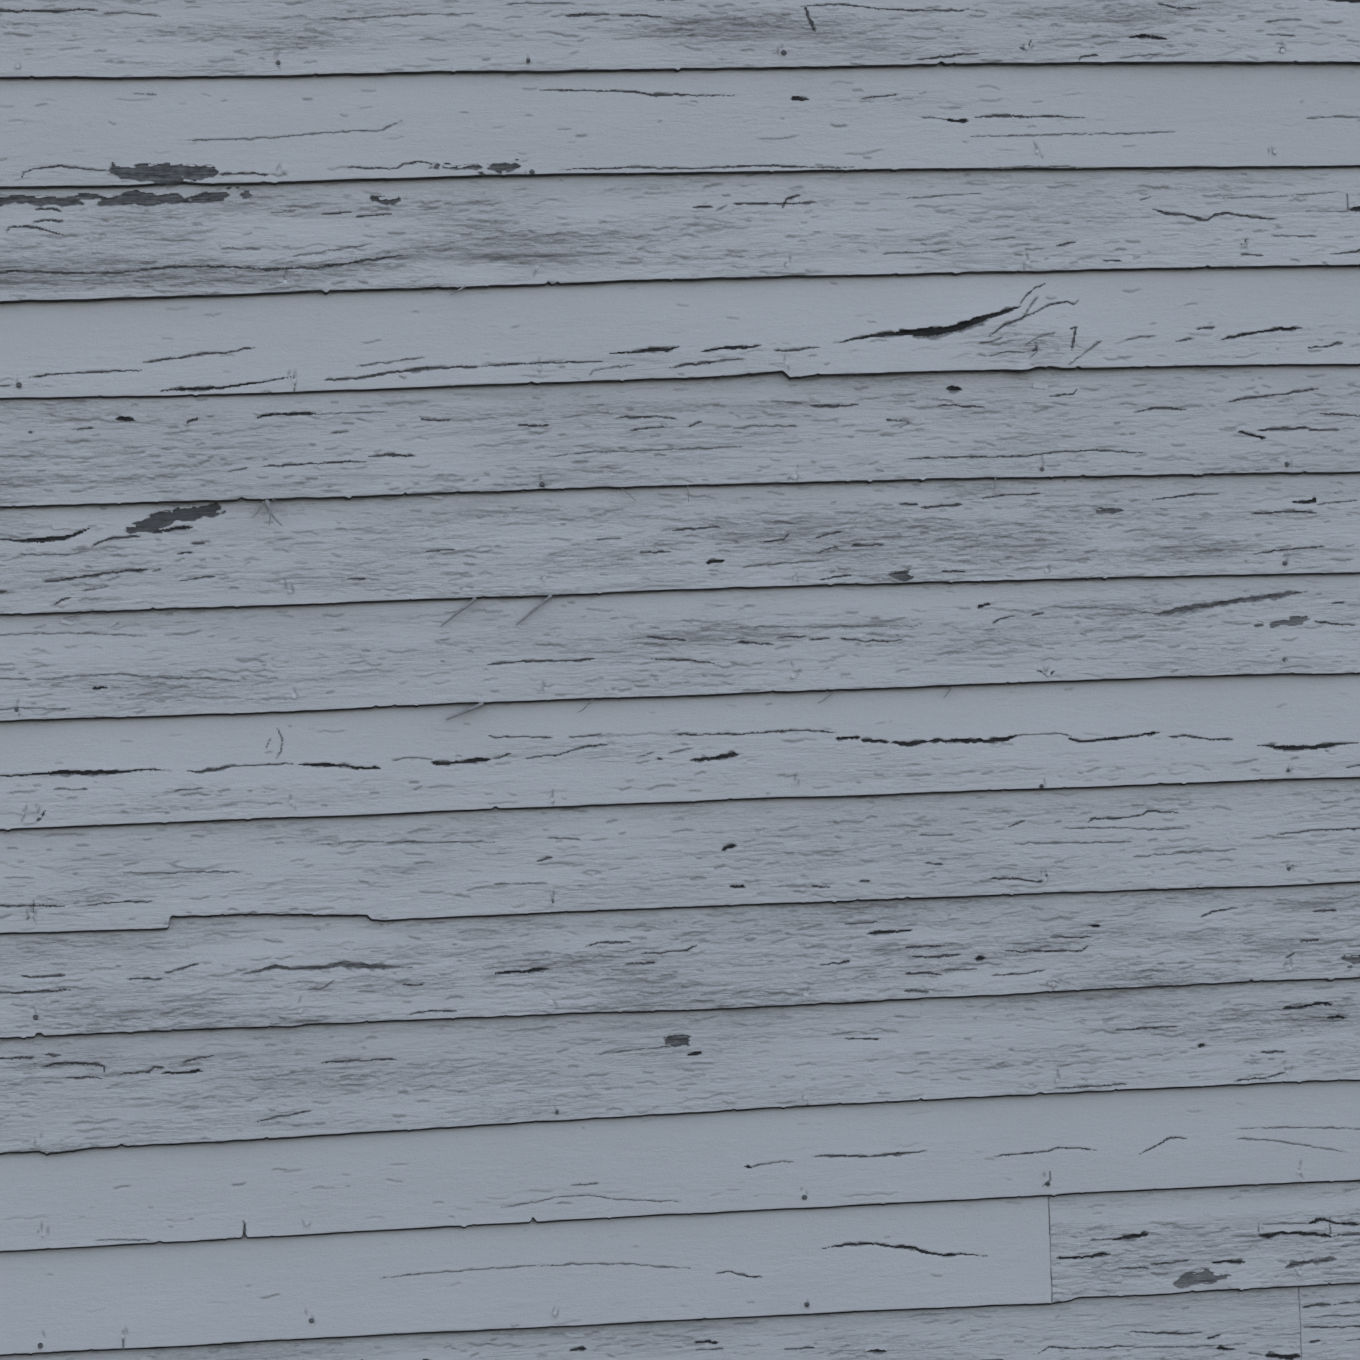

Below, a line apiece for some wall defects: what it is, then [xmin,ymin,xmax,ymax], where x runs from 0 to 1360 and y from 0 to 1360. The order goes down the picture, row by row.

peeling [0,162,253,207]
crack [0,283,1360,472]
peeling [127,503,226,534]
crack [637,729,1360,768]
crack [0,728,607,821]
peeling [664,1032,701,1056]
crack [822,1242,987,1256]
peeling [1174,1269,1232,1288]